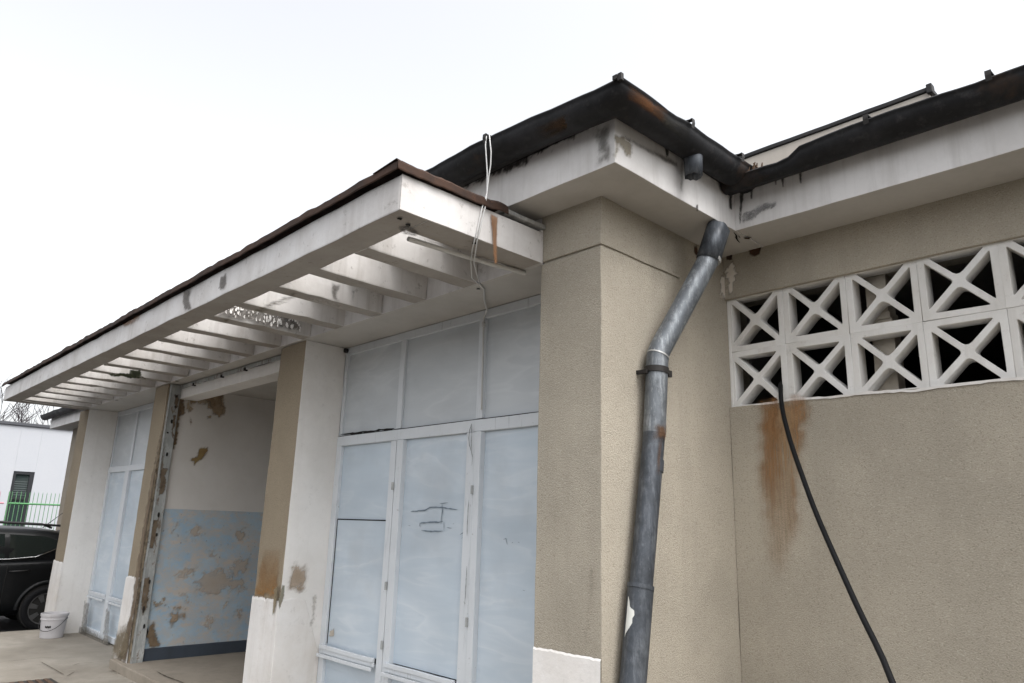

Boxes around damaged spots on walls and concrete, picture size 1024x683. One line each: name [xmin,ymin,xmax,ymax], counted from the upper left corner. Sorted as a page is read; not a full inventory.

corrosion [763,403,805,511]
spalling [118,394,225,661]
peeling [273,567,306,613]